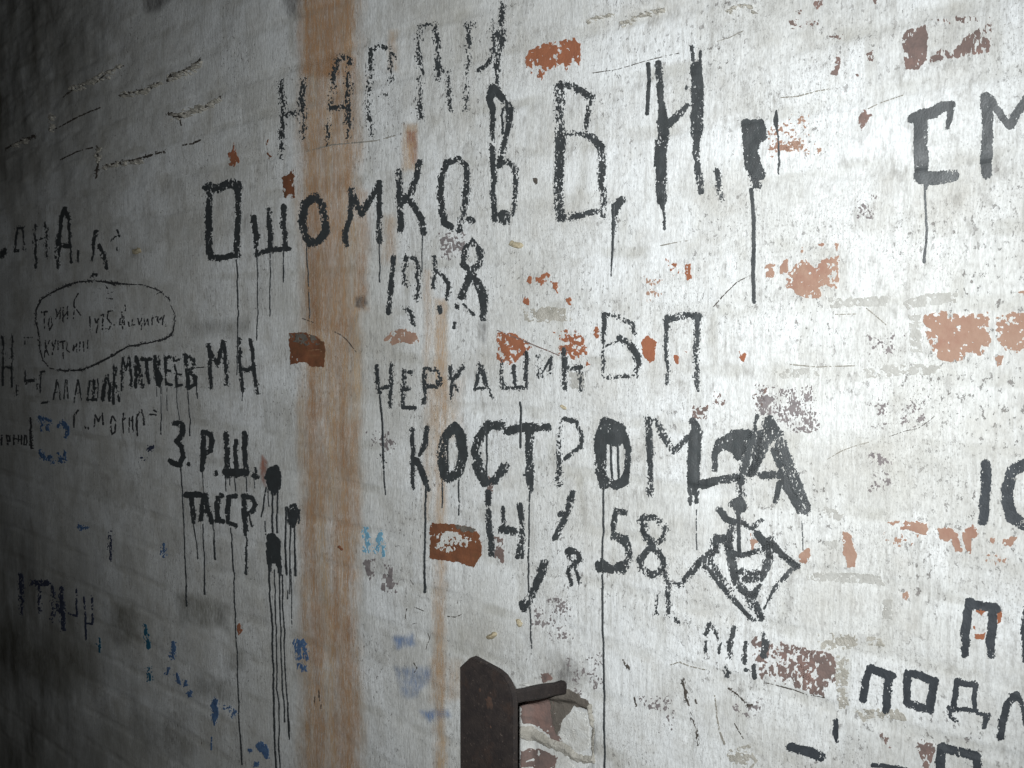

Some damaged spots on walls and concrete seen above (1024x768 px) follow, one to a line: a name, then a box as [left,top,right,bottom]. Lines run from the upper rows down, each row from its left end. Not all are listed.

peeling [524,37,581,81]
peeling [902,16,992,70]
peeling [764,243,888,308]
peeling [288,332,326,367]
peeling [496,332,532,365]
peeling [523,272,599,389]
peeling [863,292,1024,379]
corrosion [302,0,360,768]
peeling [429,523,504,568]
spalling [518,652,603,768]
peeling [751,633,907,748]
peeling [915,739,936,768]